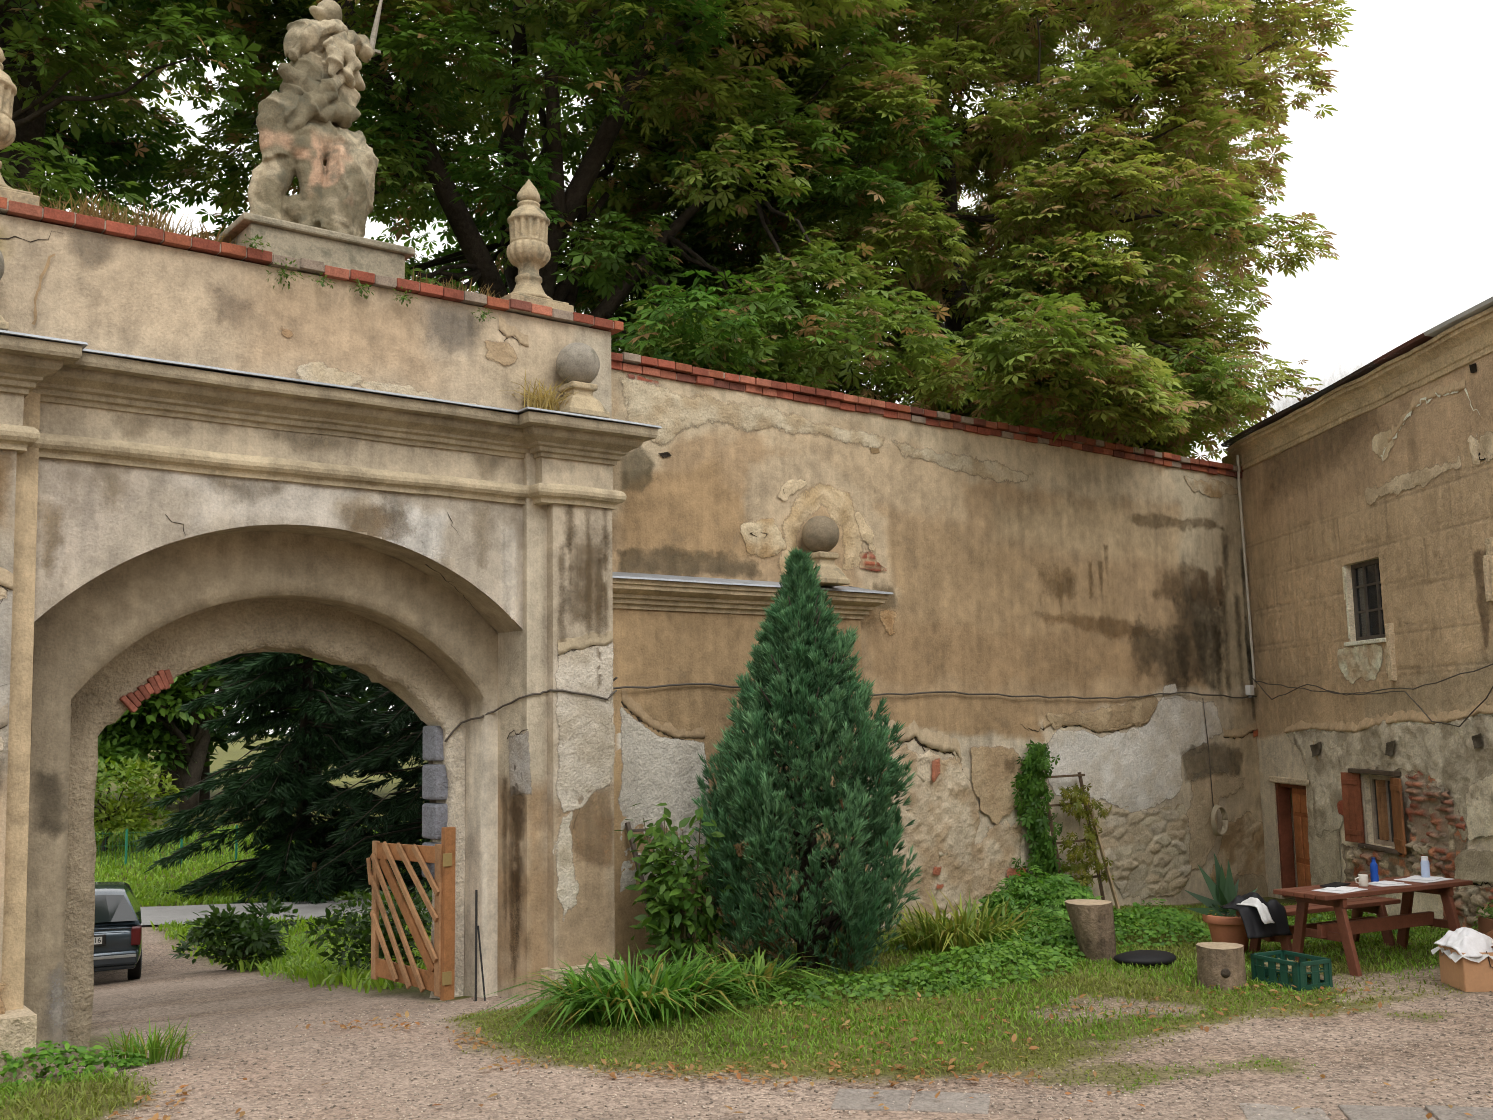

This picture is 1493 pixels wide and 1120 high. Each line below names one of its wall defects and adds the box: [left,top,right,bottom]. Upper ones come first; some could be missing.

flaking render [620,373,885,454]
flaking render [1372,379,1480,462]
flaking render [1364,431,1493,505]
crack [0,567,13,604]
water stain [560,520,607,624]
flaking render [740,518,787,559]
flaking render [859,551,887,572]
flaking render [552,631,709,919]
flaking render [1284,701,1493,841]
flaking render [873,740,1027,918]
flaking render [1443,886,1493,930]